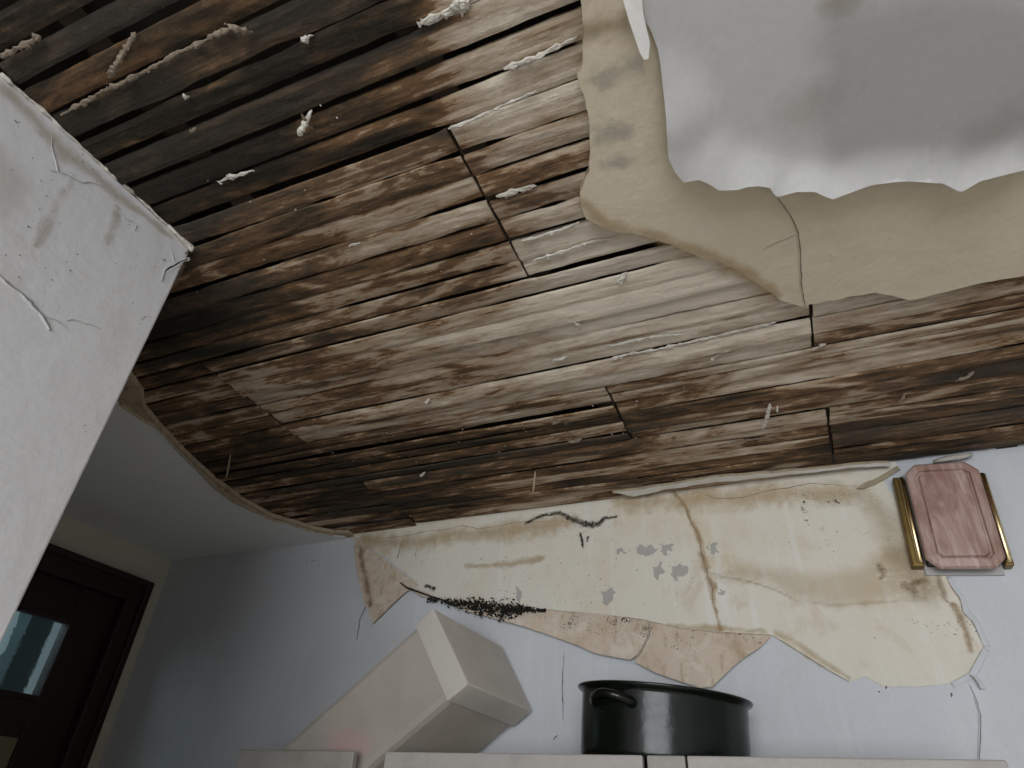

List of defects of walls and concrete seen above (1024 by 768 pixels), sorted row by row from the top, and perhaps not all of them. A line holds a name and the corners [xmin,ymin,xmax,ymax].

crack [50,137,137,231]
flaking render [577,0,1024,307]
crack [0,275,101,331]
crack [161,251,190,282]
crack [763,197,806,308]
water stain [524,511,618,548]
peeling [352,460,991,688]
crack [675,482,857,627]
crack [969,674,986,760]